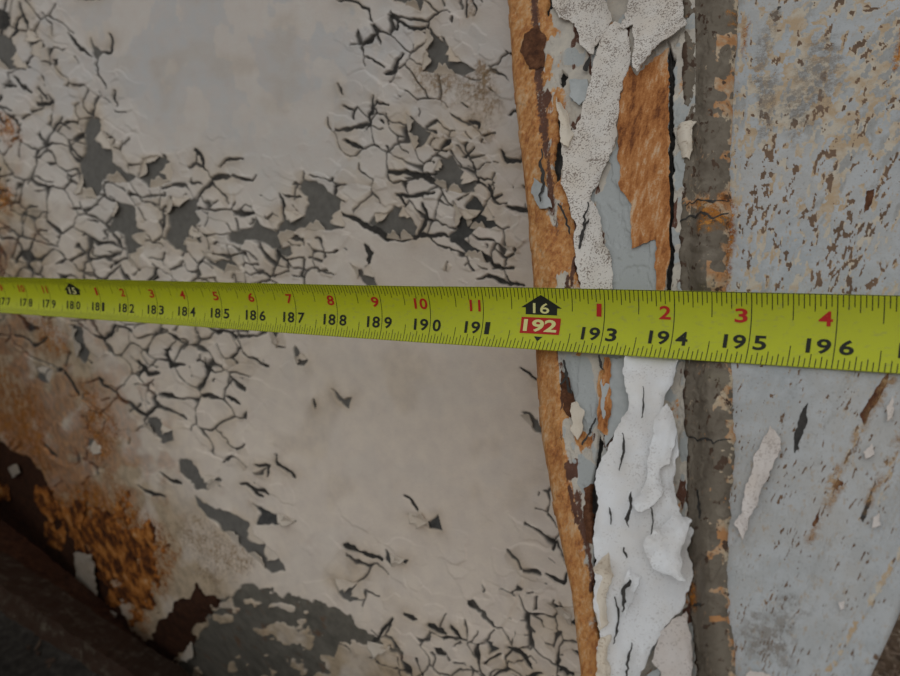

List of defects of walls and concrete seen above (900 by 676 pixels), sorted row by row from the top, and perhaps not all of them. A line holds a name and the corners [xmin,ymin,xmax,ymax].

crack [339,0,429,75]
crack [339,85,389,150]
peeling [552,0,697,290]
crack [342,169,450,264]
crack [479,254,525,286]
rust [697,194,736,285]
peeling [860,373,889,425]
rust [0,464,20,501]
rust [33,470,177,638]
peeling [583,356,694,676]
peeling [146,583,404,676]
crack [372,613,463,655]